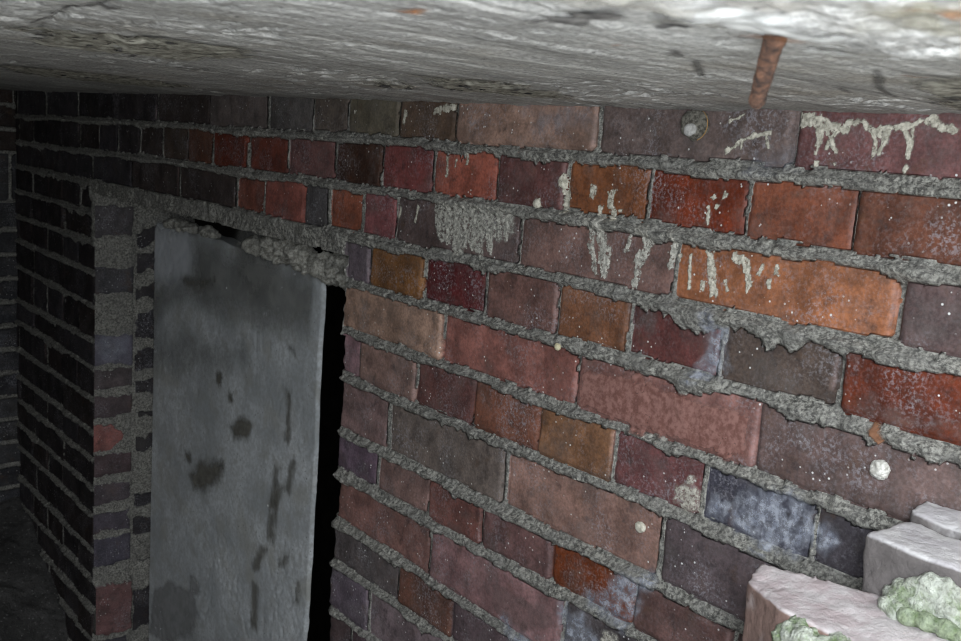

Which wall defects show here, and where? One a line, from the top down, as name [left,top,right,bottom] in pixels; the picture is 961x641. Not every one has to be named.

crack [31,0,120,24]
efflorescence [800,112,959,174]
efflorescence [558,173,571,214]
efflorescence [582,184,622,279]
efflorescence [624,222,654,290]
efflorescence [666,228,729,298]
efflorescence [731,251,779,294]
damp [231,418,251,438]
damp [186,454,224,489]
damp [267,460,295,538]
damp [150,576,199,640]